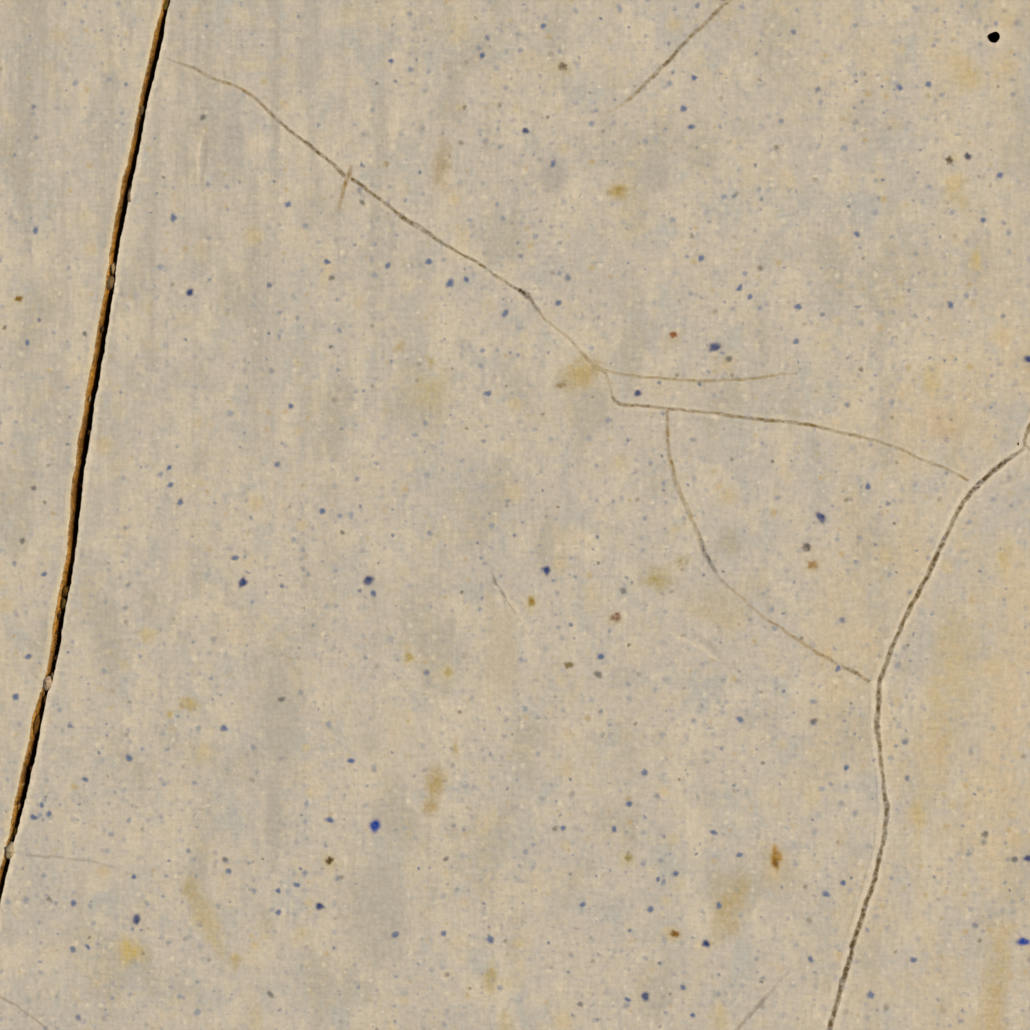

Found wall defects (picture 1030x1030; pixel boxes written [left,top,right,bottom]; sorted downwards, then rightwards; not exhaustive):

crack [0,0,176,938]
crack [165,54,1030,1030]
crack [595,0,734,121]
crack [0,995,50,1030]